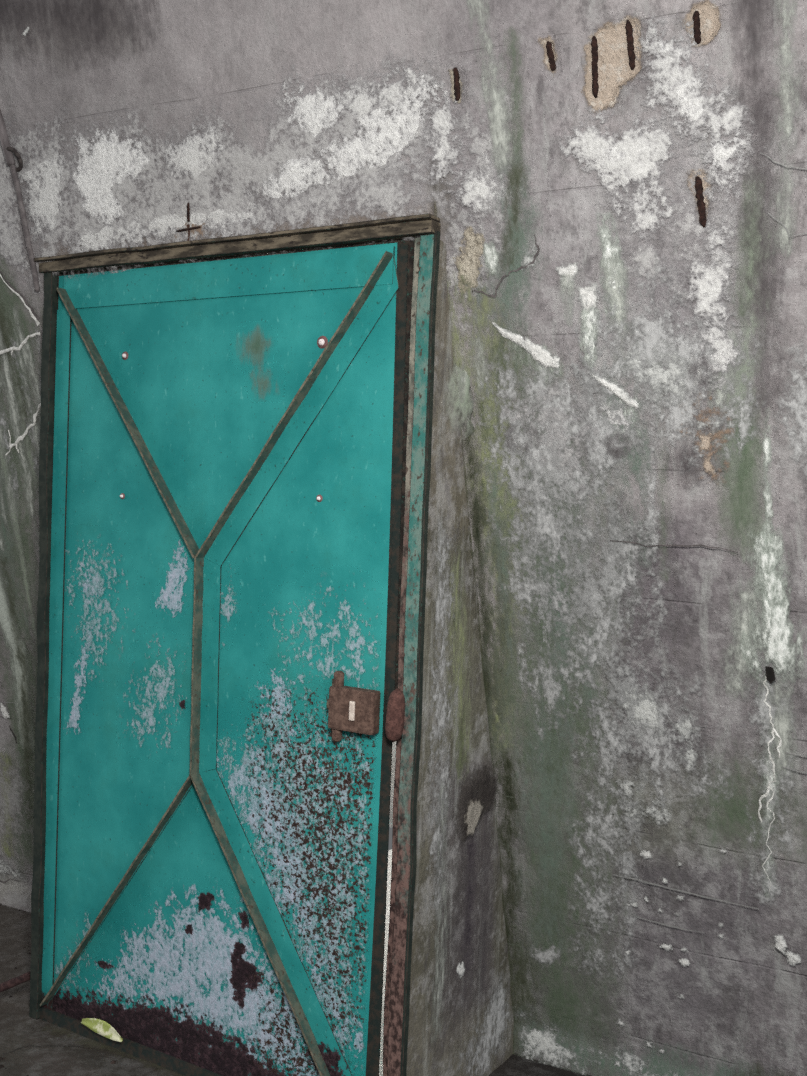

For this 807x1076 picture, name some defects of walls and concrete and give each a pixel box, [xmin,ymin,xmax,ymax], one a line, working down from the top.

crack [0,271,41,355]
damp [467,0,521,274]
flaking render [560,0,766,328]
damp [738,0,761,76]
damp [744,173,792,309]
damp [754,0,798,175]
crack [5,403,41,455]
damp [780,344,807,476]
damp [0,579,32,791]
damp [458,249,767,1076]
damp [427,523,457,1027]